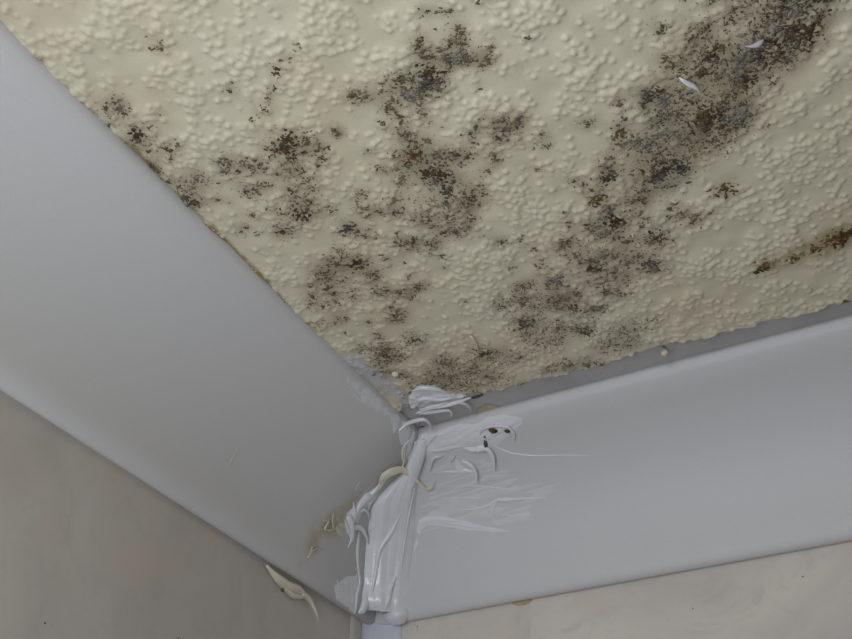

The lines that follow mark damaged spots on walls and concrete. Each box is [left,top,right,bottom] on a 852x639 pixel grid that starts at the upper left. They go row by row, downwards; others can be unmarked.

damp [95,0,845,407]
peeling [376,446,435,494]